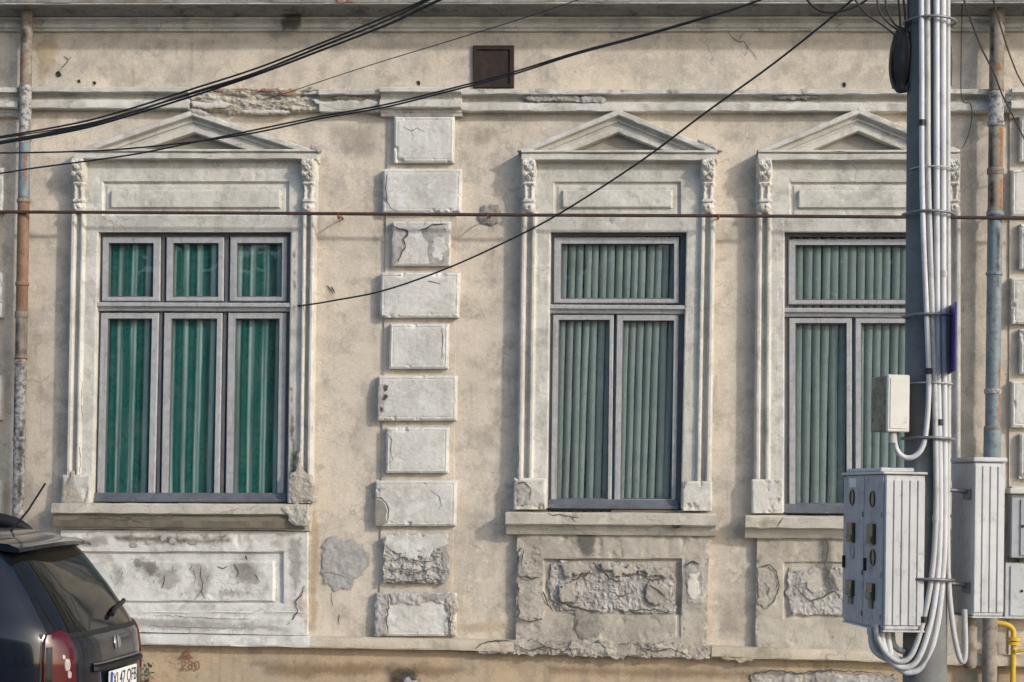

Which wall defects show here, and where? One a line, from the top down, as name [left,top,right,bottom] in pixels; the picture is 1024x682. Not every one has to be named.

spalling [188,87,378,117]
spalling [281,420,318,526]
spalling [374,532,460,637]
spalling [475,547,898,682]